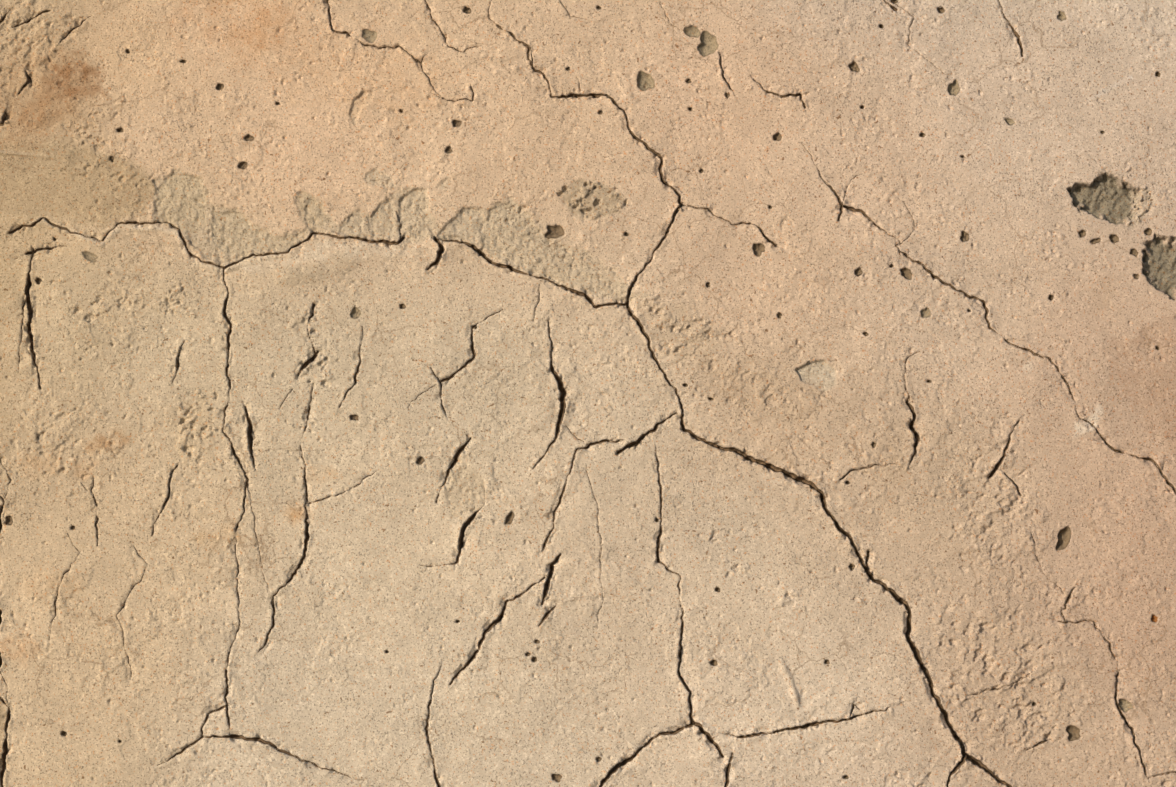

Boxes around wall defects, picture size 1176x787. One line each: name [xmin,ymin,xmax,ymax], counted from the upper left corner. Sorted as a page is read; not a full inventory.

crack [327,0,477,102]
crack [998,0,1023,57]
spalling [1066,168,1176,301]
crack [409,309,503,414]
crack [425,1,1012,787]
crack [801,143,1176,496]
crack [0,459,10,532]
crack [8,212,404,781]
crack [0,653,10,787]
crack [1031,534,1176,779]